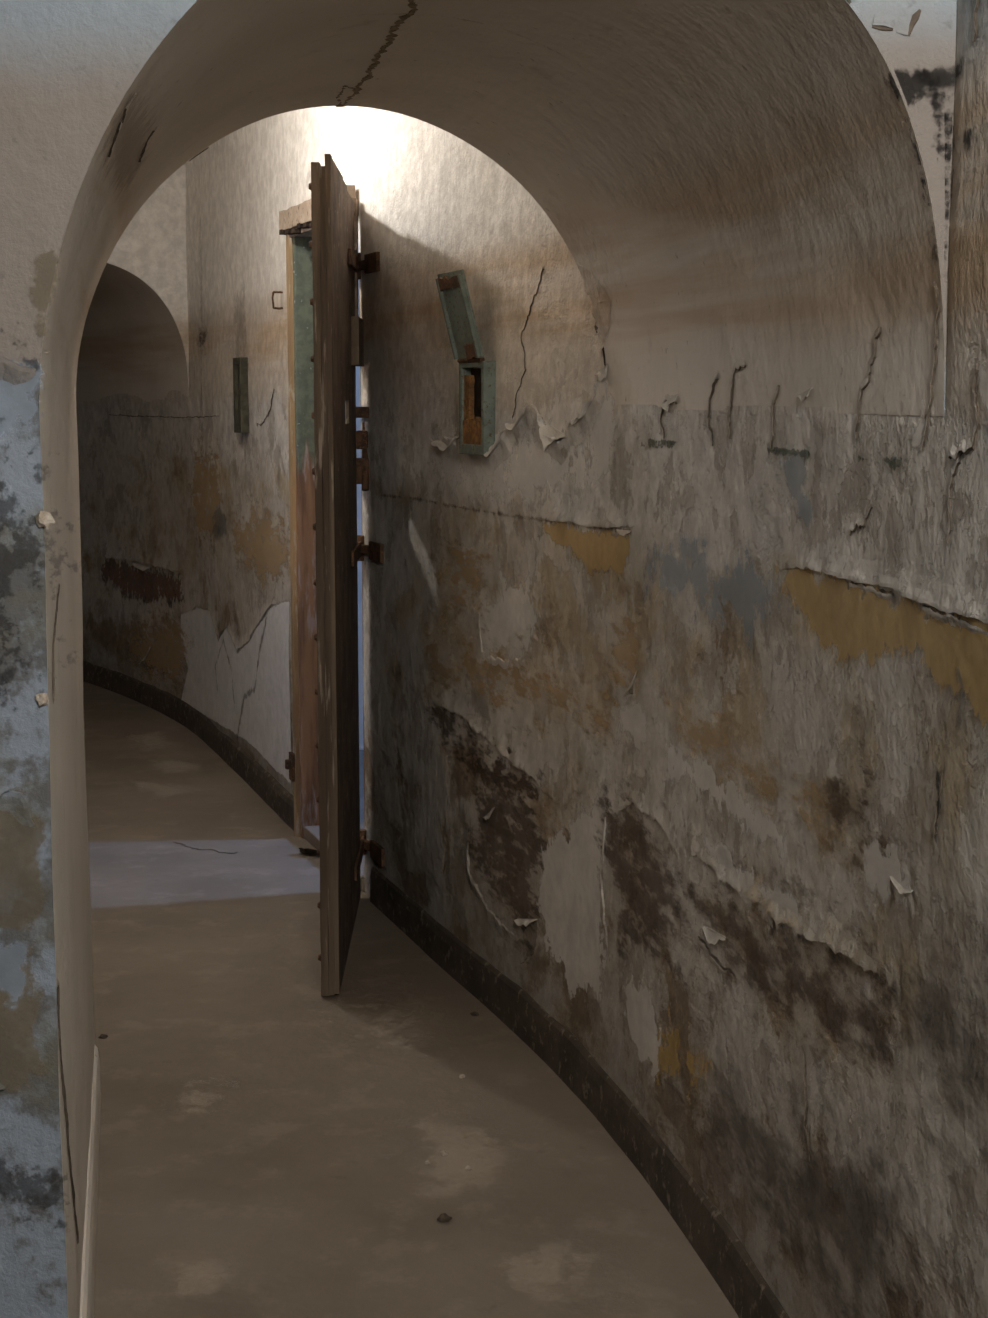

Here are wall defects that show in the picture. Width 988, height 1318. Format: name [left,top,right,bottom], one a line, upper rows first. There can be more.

crack [336,0,431,107]
water stain [888,59,977,161]
crack [511,265,544,419]
peeling [429,375,634,577]
crack [707,359,746,446]
crack [769,385,812,449]
crack [854,326,882,440]
crack [909,282,988,543]
peeling [97,545,291,784]
peeling [775,545,988,728]
water stain [793,742,889,866]
water stain [711,1092,903,1318]